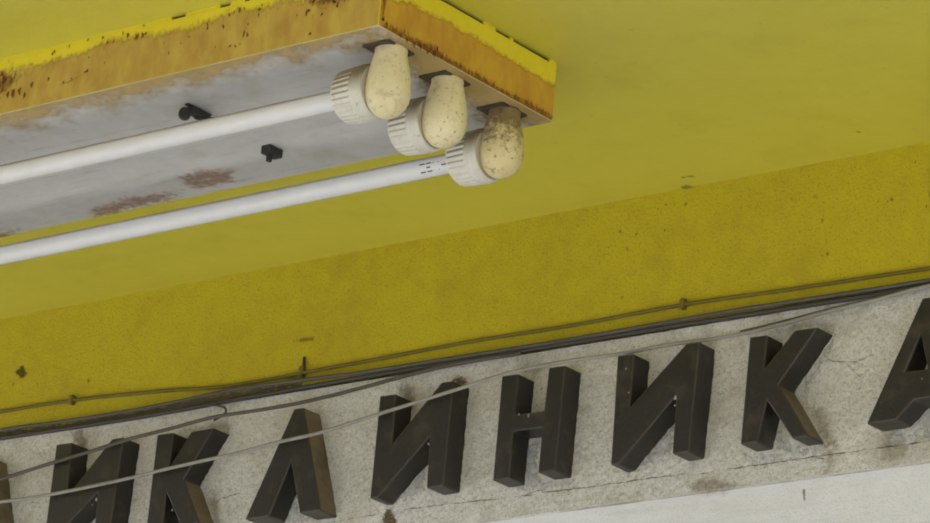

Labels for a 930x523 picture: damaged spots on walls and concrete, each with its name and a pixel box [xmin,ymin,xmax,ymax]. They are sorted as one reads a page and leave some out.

corrosion [383,509,397,523]